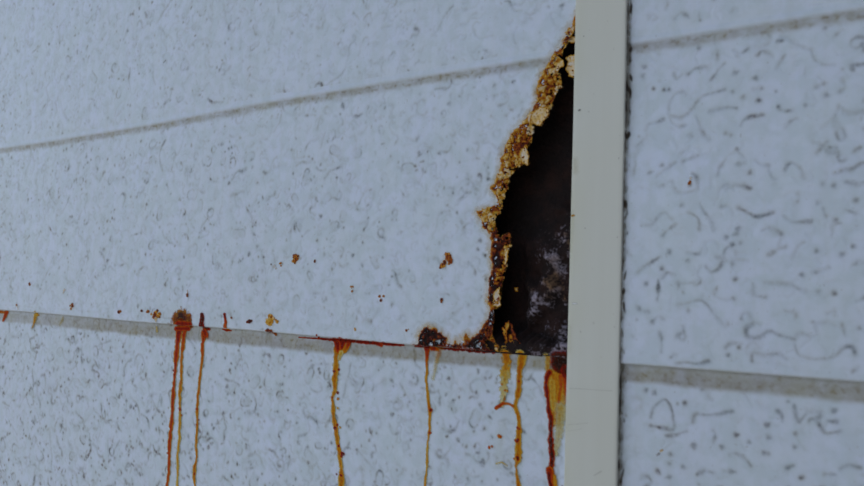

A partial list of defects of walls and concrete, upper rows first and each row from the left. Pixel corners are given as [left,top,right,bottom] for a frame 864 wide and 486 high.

peeling [555,26,575,78]
peeling [530,106,549,126]
peeling [519,146,529,165]
corrosion [298,16,575,486]
peeling [494,321,521,352]
corrosion [165,309,210,486]